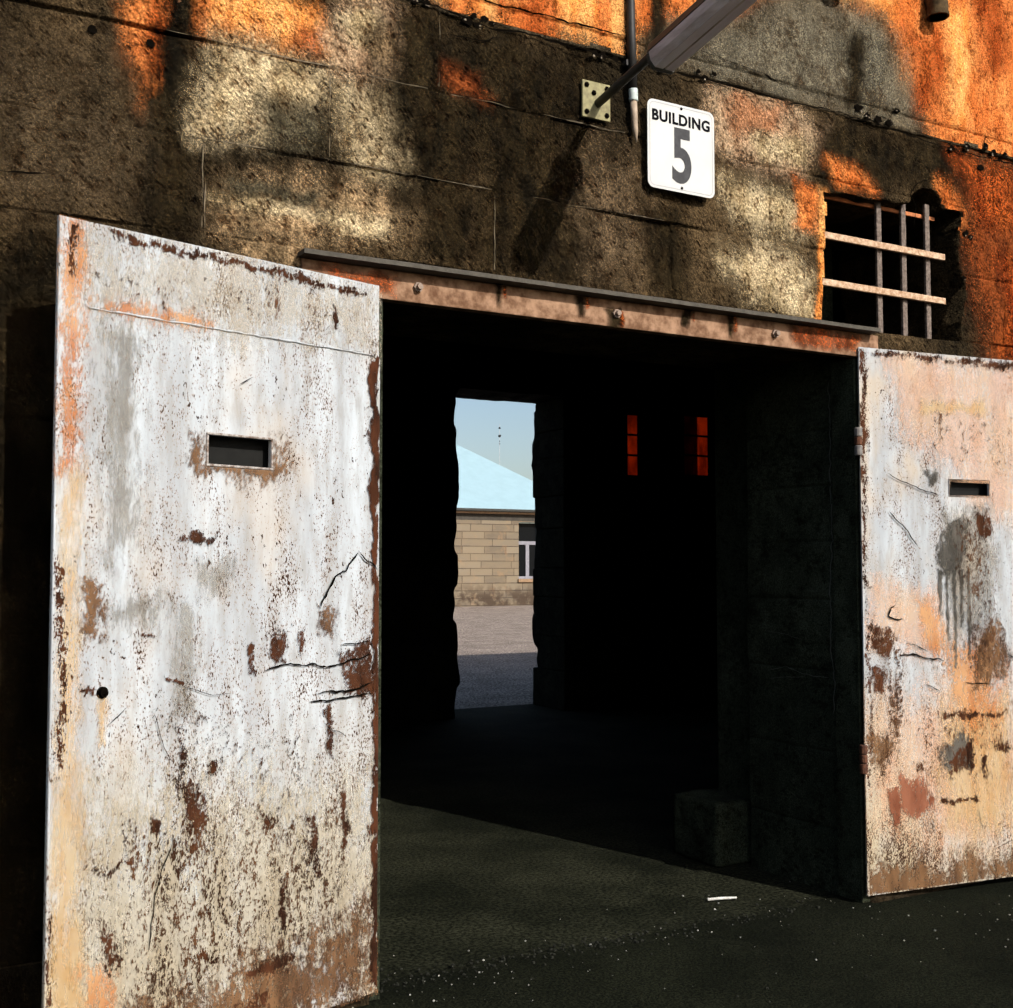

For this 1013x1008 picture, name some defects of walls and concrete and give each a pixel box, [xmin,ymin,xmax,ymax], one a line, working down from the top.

corrosion [122,0,169,109]
corrosion [190,0,334,59]
corrosion [451,0,697,55]
corrosion [106,228,391,330]
corrosion [55,218,88,475]
corrosion [794,0,1013,783]
crack [320,553,377,609]
corrosion [45,355,380,1008]
crack [265,653,371,671]
corrosion [887,760,935,827]
corrosion [869,846,1013,895]